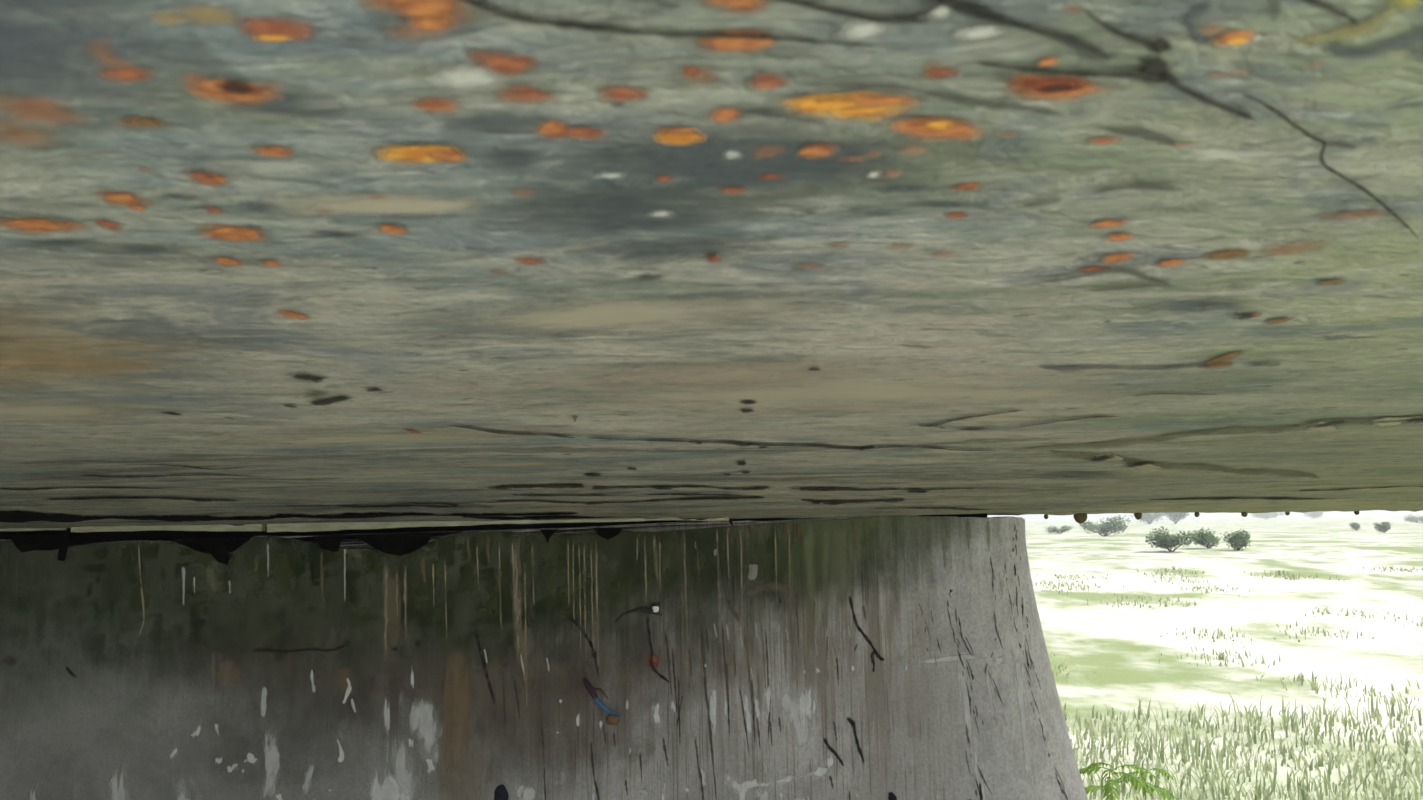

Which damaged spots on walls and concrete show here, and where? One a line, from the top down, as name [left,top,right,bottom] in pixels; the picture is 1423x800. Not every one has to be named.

rust [702,30,775,51]
rust [1017,58,1098,99]
rust [381,146,462,162]
rust [786,93,978,140]
crack [462,0,1418,238]
leakage [182,568,230,604]
leakage [275,537,716,800]
peeling [714,622,854,746]
leakage [716,521,860,756]
crack [849,597,884,672]
peeling [215,734,283,800]
peeling [371,702,438,800]